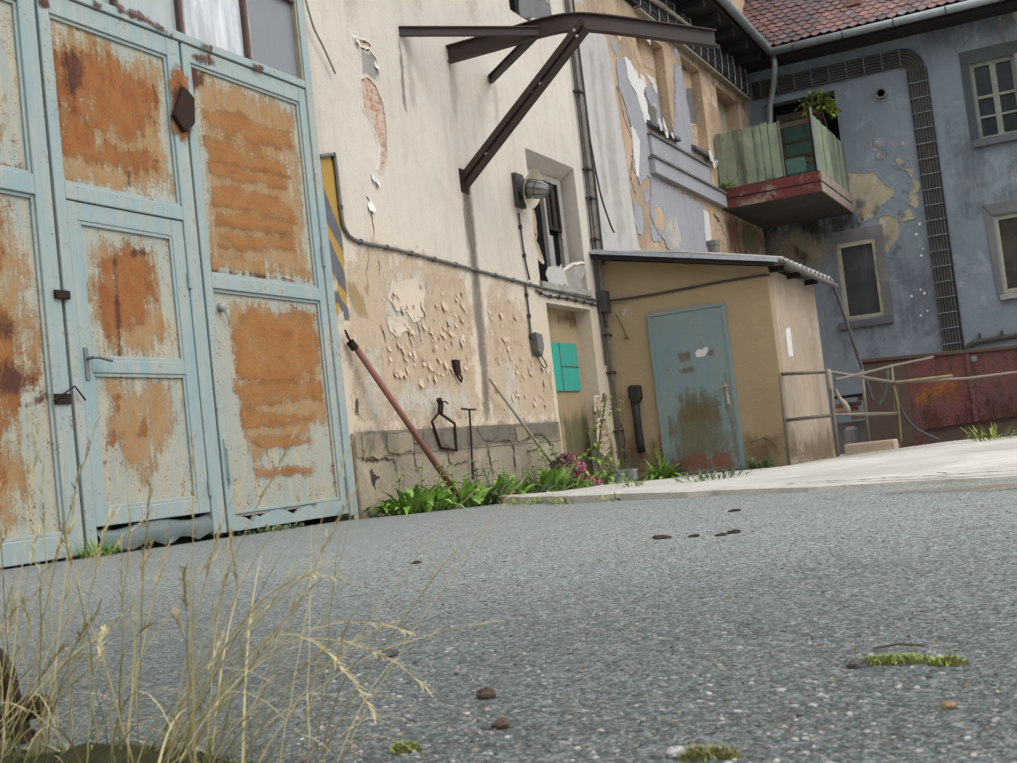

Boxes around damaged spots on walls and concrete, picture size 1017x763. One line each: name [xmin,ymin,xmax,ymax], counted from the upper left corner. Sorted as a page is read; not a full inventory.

corrosion [51,25,312,282]
flaking render [352,35,388,186]
flaking render [610,35,718,252]
flaking render [847,136,922,258]
corrosion [0,200,48,525]
corrosion [86,238,168,357]
corrosion [229,301,327,479]
peeling [333,237,563,459]
corrosion [669,382,737,473]